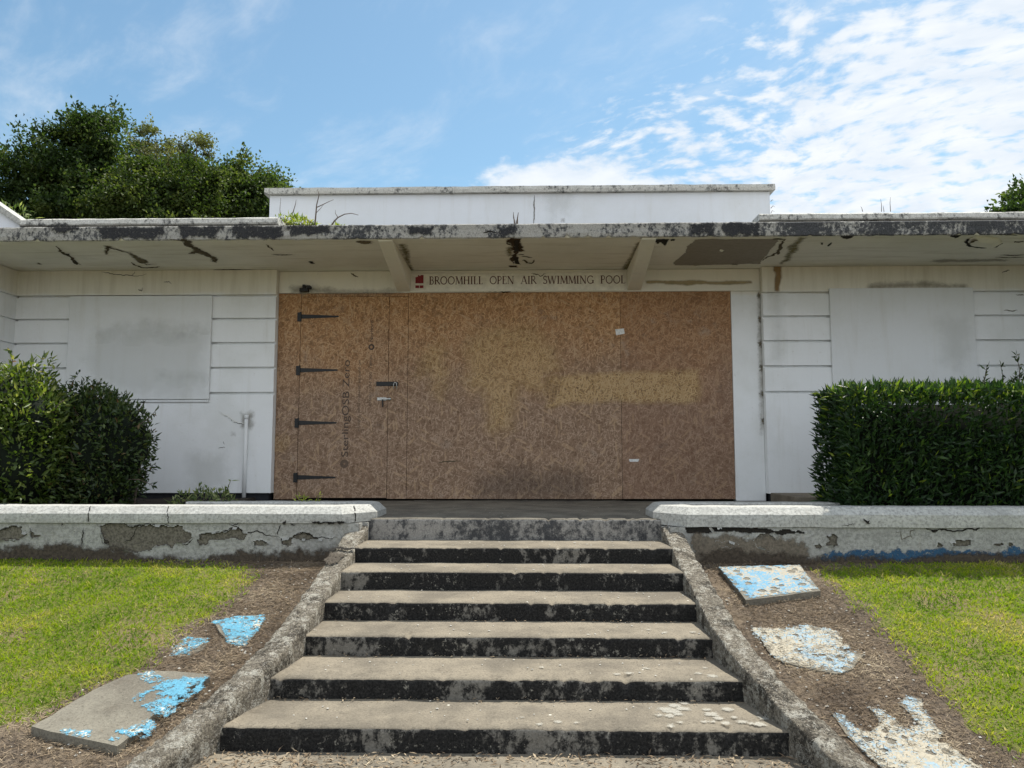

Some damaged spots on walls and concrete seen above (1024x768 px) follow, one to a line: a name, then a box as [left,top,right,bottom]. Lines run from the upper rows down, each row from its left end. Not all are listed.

peeling [673,239,778,266]
peeling [0,525,41,543]
peeling [100,523,333,553]
peeling [690,527,838,563]
peeling [937,539,970,549]